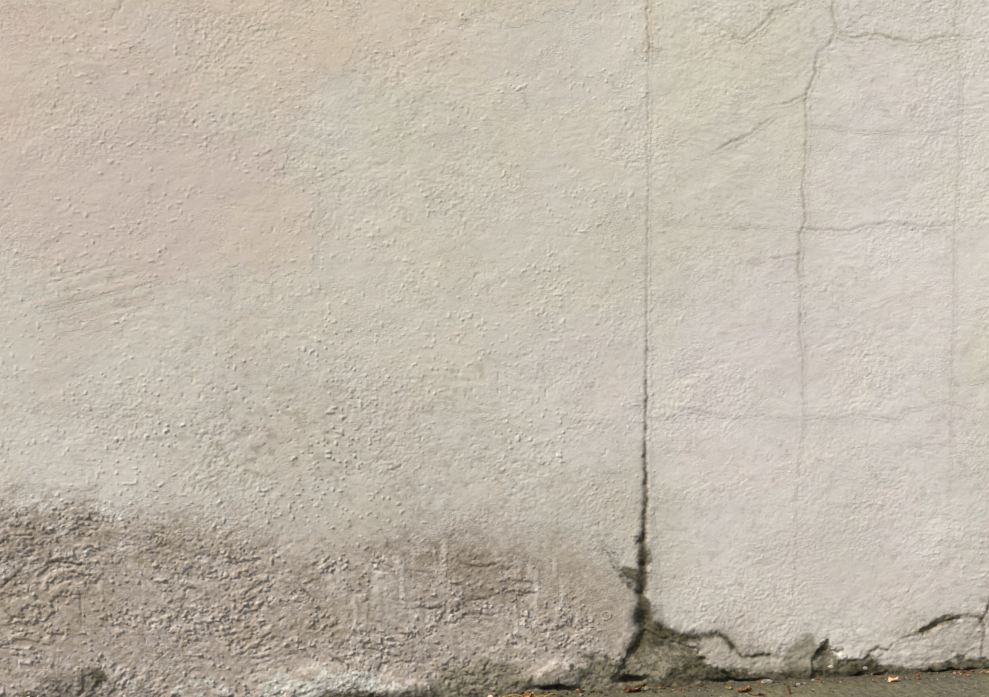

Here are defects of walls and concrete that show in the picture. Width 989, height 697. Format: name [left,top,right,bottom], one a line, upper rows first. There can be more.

crack [598,0,989,687]
water stain [0,480,630,697]
spalling [635,652,682,680]